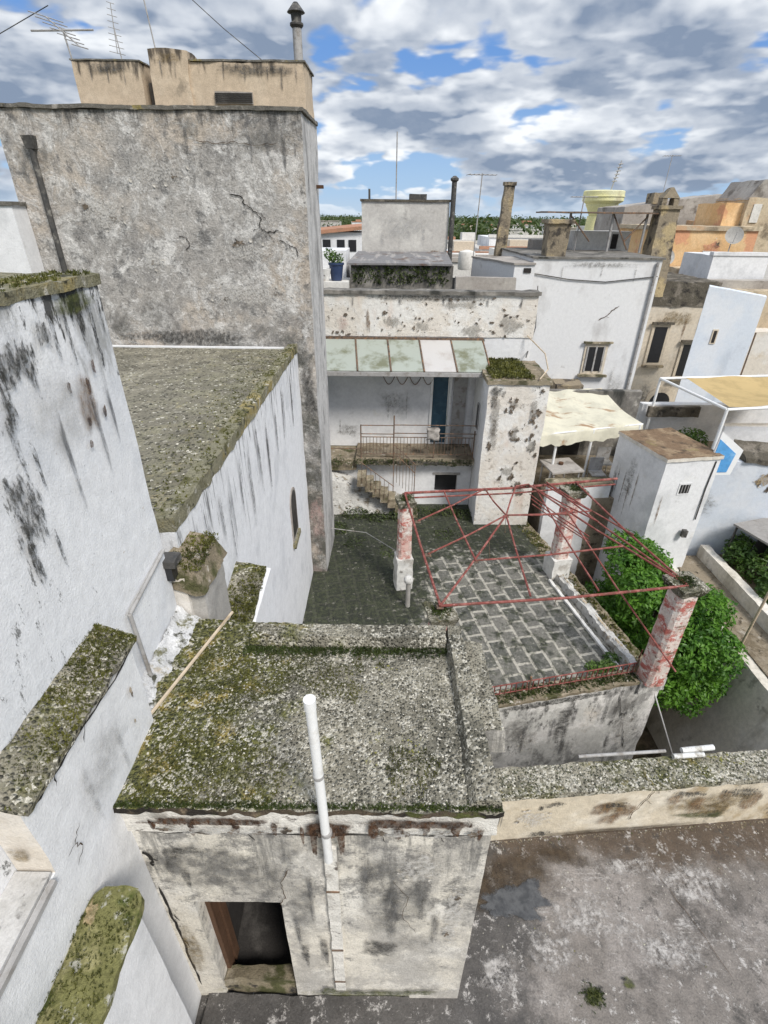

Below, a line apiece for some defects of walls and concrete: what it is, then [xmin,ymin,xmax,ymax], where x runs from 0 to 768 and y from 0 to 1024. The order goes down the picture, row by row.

crack [230,194,298,255]
peeling [377,311,433,331]
peeling [425,297,530,341]
flaking render [486,384,545,457]
peeling [497,461,524,496]
rust [136,818,279,836]
rust [300,823,351,855]
rust [365,820,484,840]
leakage [593,802,635,824]
leakage [669,787,761,818]
leakage [477,849,583,907]
leakage [366,886,439,956]